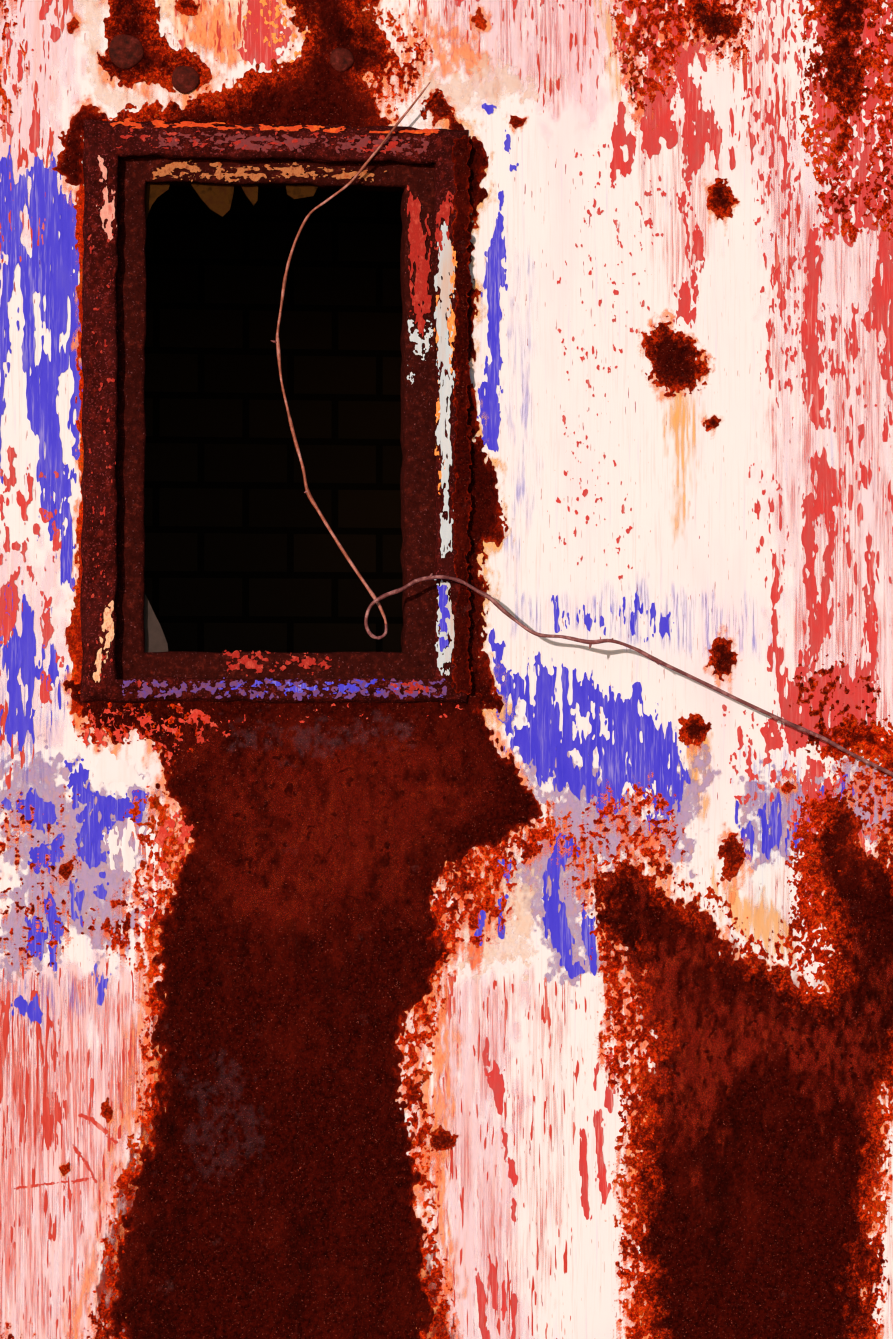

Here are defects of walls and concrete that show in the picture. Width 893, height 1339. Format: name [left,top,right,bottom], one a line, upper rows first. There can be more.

peeling [103,117,439,182]
corrosion [52,0,491,487]
corrosion [600,0,759,129]
corrosion [792,0,893,245]
peeling [0,110,117,752]
peeling [404,185,457,558]
corrosion [641,310,721,528]
peeling [540,0,893,863]
corrosion [0,786,81,977]
peeling [1,579,462,972]
peeling [488,628,691,836]
corrosion [704,633,738,686]